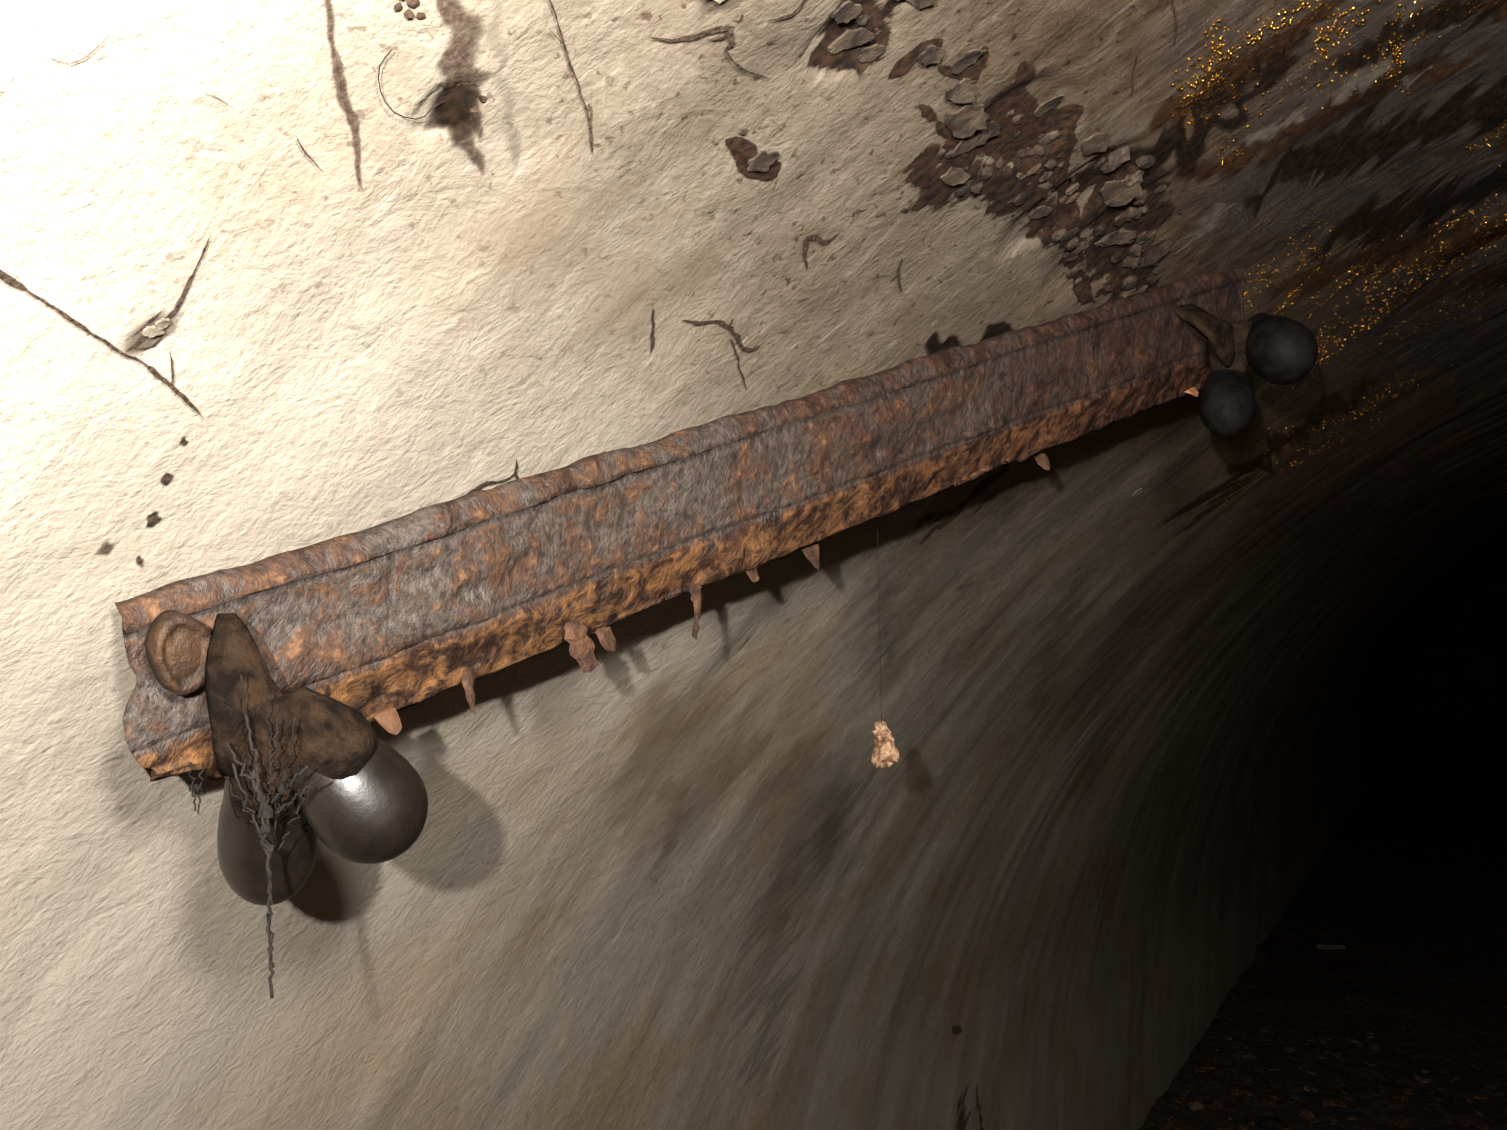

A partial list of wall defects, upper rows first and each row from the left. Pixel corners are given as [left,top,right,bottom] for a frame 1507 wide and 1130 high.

leakage [425,0,489,171]
leakage [1074,18,1311,185]
spalling [725,128,781,181]
spalling [808,0,1177,305]
leakage [1175,0,1507,268]
crack [0,235,211,419]
corrosion [1035,453,1050,470]
corrosion [745,567,759,582]
corrosion [802,543,820,570]
corrosion [564,620,616,673]
corrosion [462,668,476,714]
corrosion [374,708,402,735]